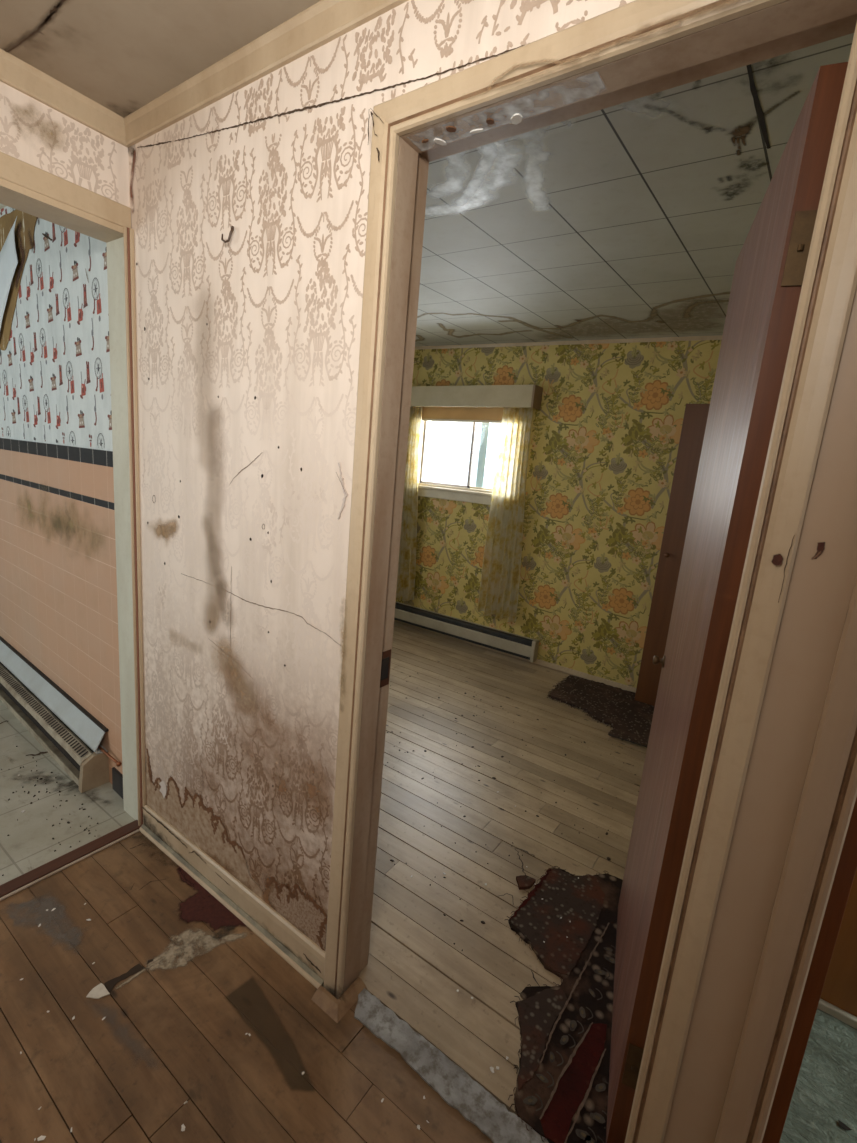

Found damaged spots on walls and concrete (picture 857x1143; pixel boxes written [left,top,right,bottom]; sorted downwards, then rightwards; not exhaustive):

crack [4,0,66,52]
water stain [487,0,739,90]
crack [137,43,529,161]
water stain [731,91,800,170]
water stain [425,141,547,216]
water stain [417,292,730,338]
water stain [155,522,176,539]
water stain [220,646,328,816]
peeling [148,759,170,799]
water stain [177,866,250,939]